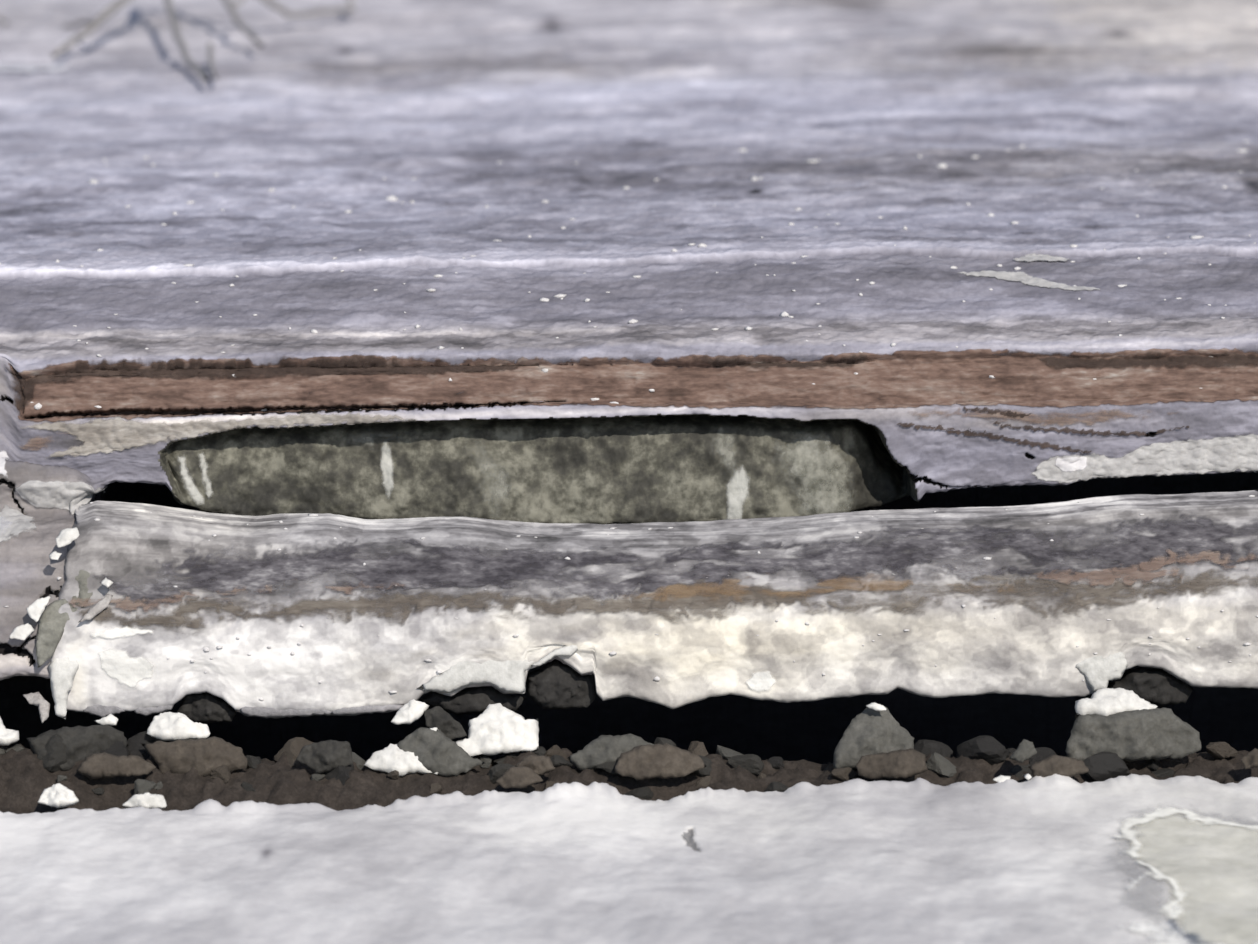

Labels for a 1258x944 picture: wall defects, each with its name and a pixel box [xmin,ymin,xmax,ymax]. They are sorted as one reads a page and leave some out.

crack [154,402,536,416]
spalling [1025,433,1258,483]
crack [0,478,24,514]
crack [0,636,36,666]